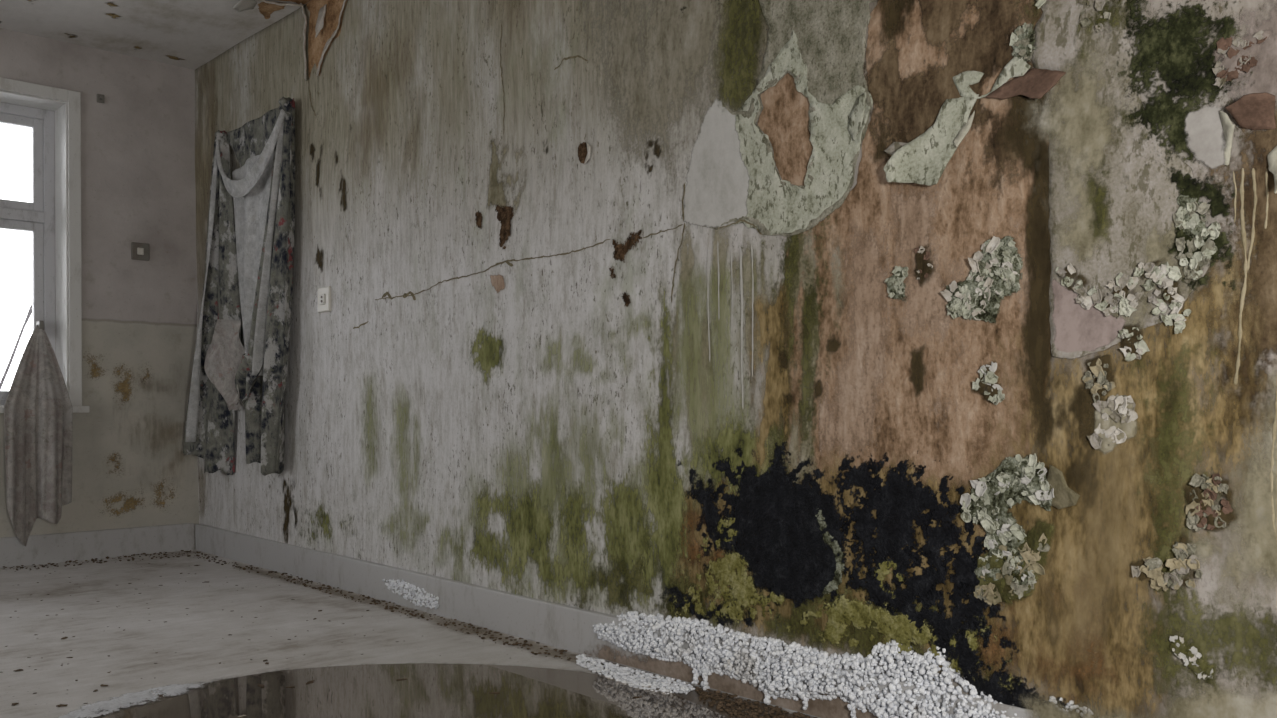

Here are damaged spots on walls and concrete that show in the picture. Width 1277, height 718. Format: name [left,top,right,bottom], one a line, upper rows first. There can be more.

spalling [233,0,348,116]
crack [353,239,610,329]
peeling [475,141,523,249]
spalling [609,230,644,279]
spalling [645,140,661,173]
crack [643,184,685,303]
crack [717,219,763,235]
flaking render [683,0,1277,605]
water stain [87,355,150,402]
water stain [584,0,1277,718]
water stain [103,483,175,516]
water stain [382,579,439,609]